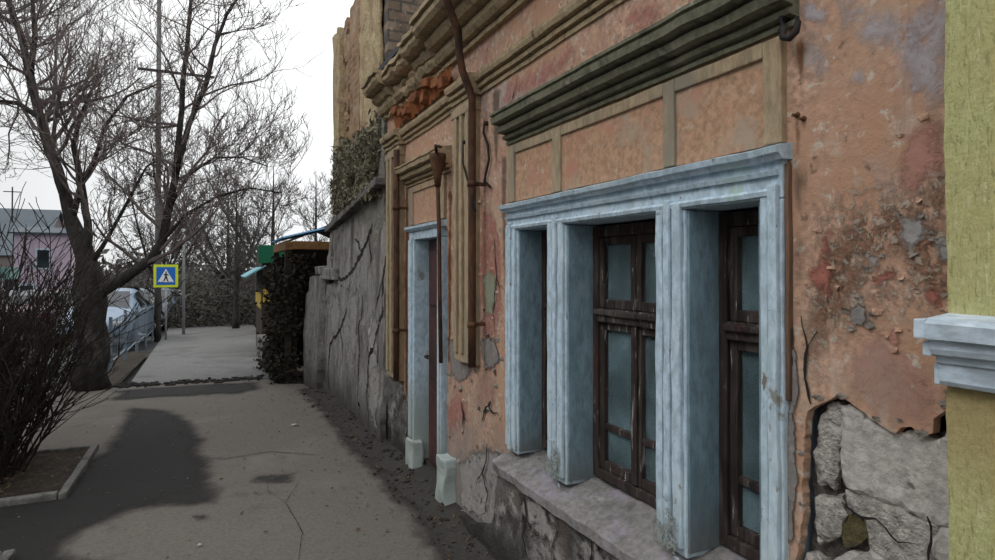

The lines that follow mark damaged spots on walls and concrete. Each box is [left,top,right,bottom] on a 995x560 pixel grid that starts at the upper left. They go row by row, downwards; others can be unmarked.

spalling [390,65,453,128]
peeling [805,112,948,353]
crack [326,223,386,415]
crack [791,316,818,404]
spalling [456,445,502,523]
crack [522,497,539,558]
spalling [796,393,949,560]